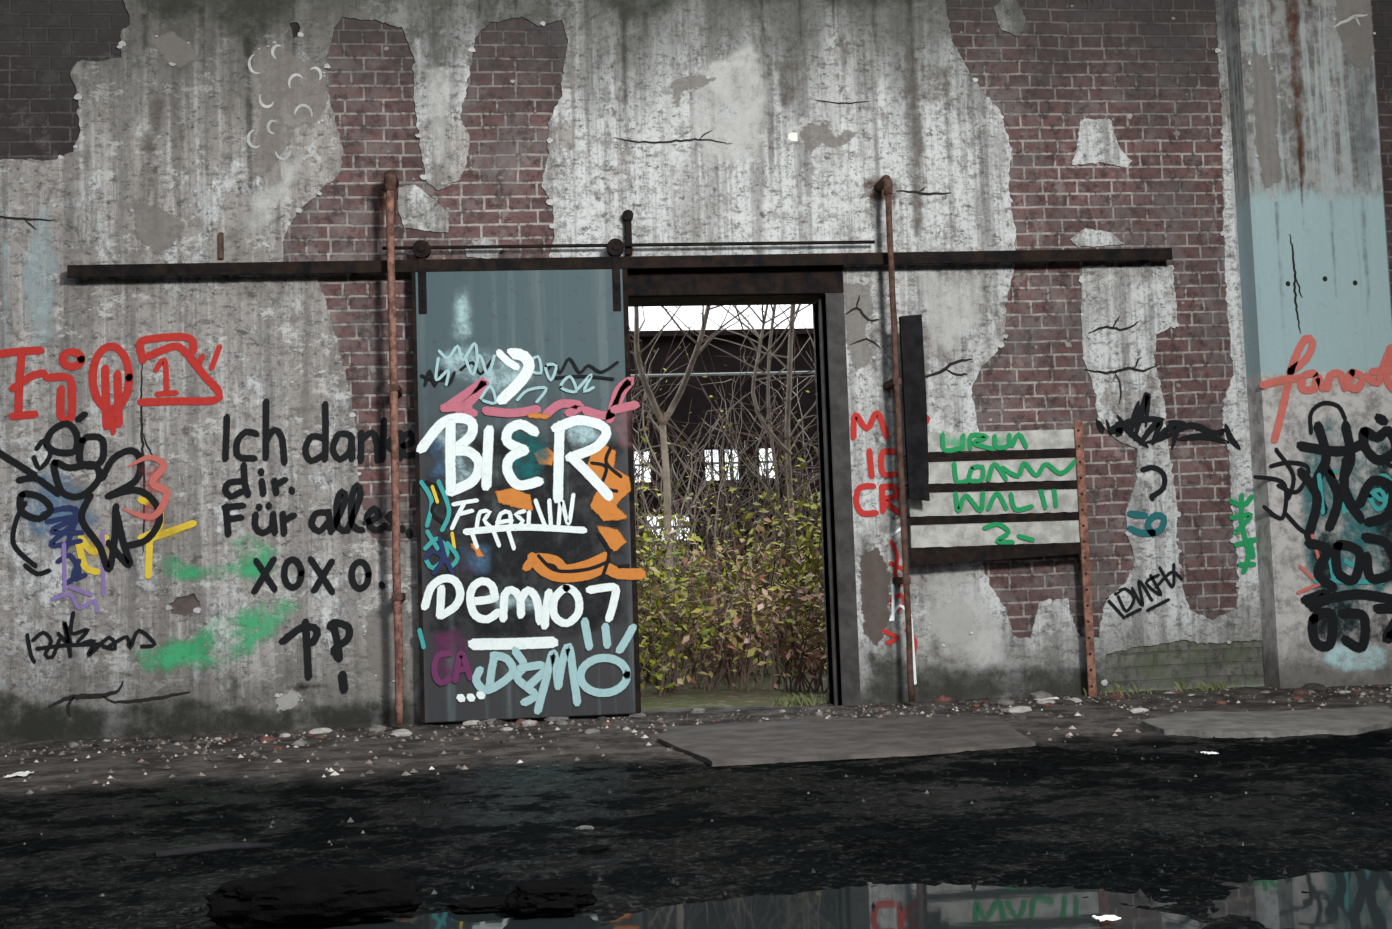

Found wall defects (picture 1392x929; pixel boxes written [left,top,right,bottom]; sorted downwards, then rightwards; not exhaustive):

spalling [0,0,130,161]
peeling [247,94,277,148]
peeling [248,23,304,74]
spalling [283,17,568,550]
spalling [945,0,1241,638]
spalling [1101,640,1265,693]